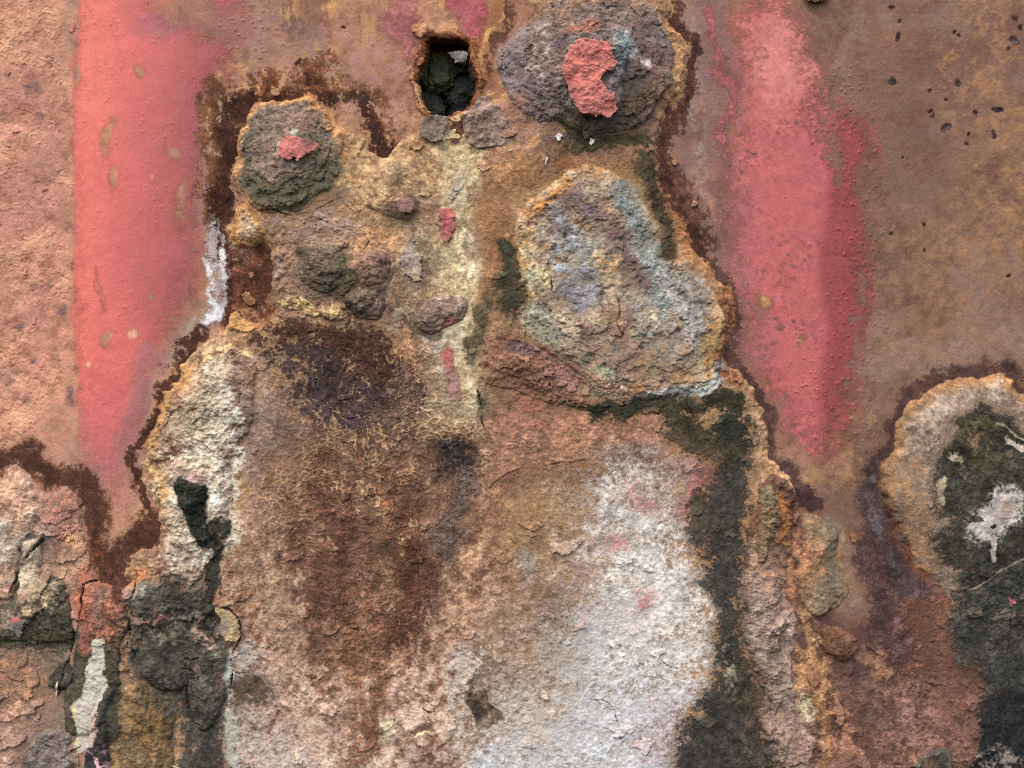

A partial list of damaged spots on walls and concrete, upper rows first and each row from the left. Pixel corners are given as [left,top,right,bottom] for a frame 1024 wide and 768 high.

hole [408,27,512,151]
peeling [278,135,320,161]
efflorescence [200,218,230,326]
peeling [438,208,455,244]
damp [197,515,232,636]
spalling [414,430,483,565]
damp [435,394,750,768]
efflorescence [944,484,1024,591]
corrosion [166,691,202,768]
damp [218,636,331,768]
spalling [464,681,506,729]
corrosion [599,636,640,679]